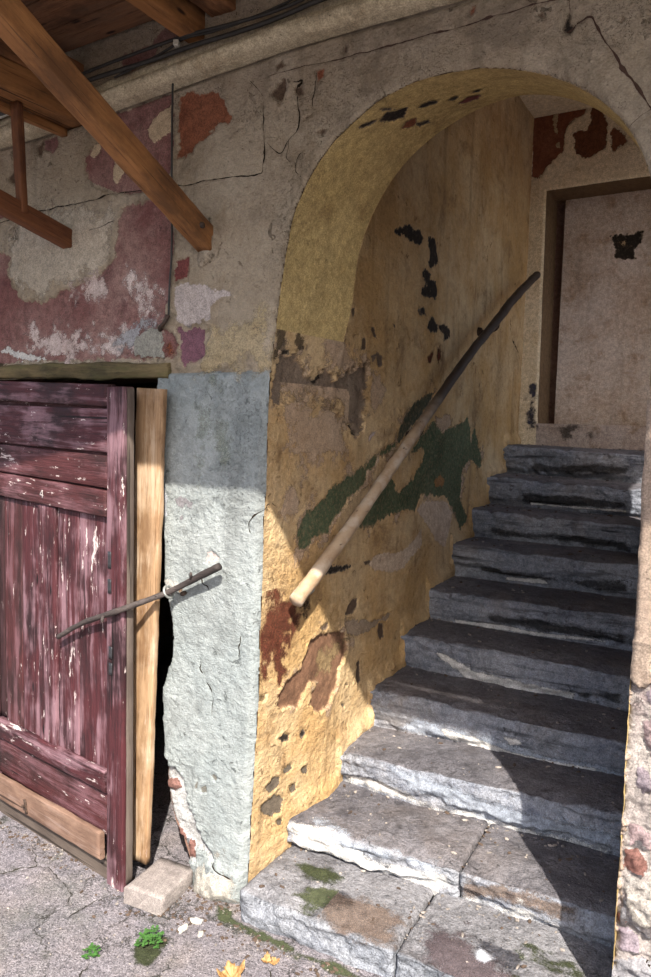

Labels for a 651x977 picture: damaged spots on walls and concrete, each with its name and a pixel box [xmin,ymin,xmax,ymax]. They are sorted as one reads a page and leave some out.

crack [39,190,142,212]
peeling [0,143,231,367]
peeling [116,90,232,174]
crack [178,0,651,186]
peeling [394,224,450,341]
peeling [531,108,627,179]
flaking render [271,327,382,439]
peeling [293,379,484,568]
flaking render [277,598,391,717]
flaking render [168,766,231,880]
flaking render [260,764,307,825]
flaking render [612,681,651,977]